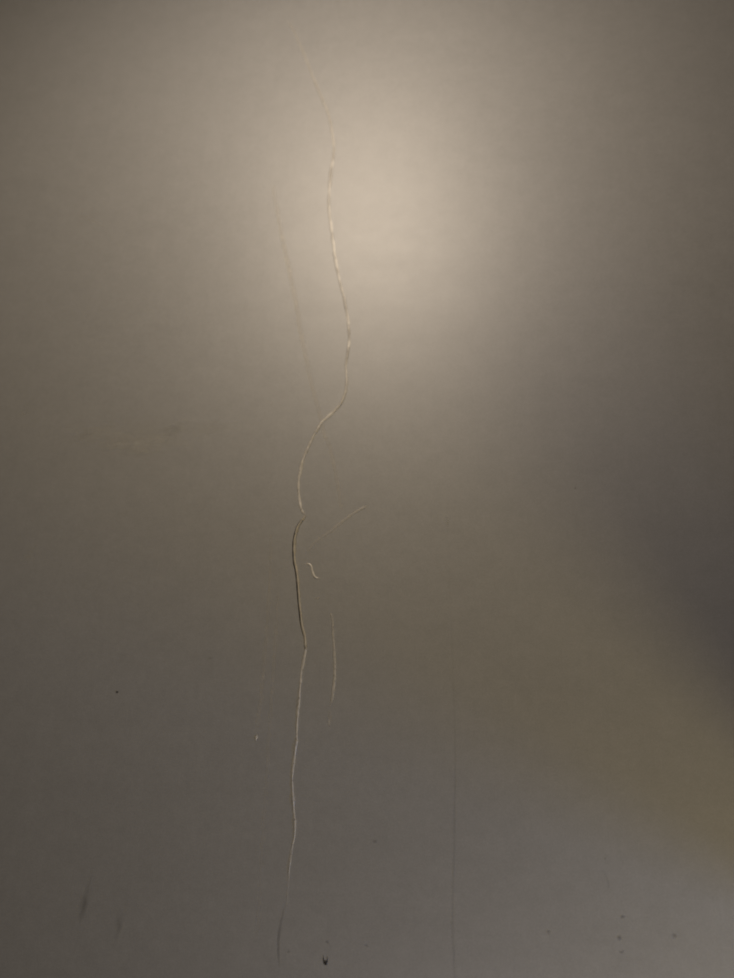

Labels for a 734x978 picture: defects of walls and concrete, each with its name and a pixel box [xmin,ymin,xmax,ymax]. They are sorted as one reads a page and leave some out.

crack [289,46,350,861]